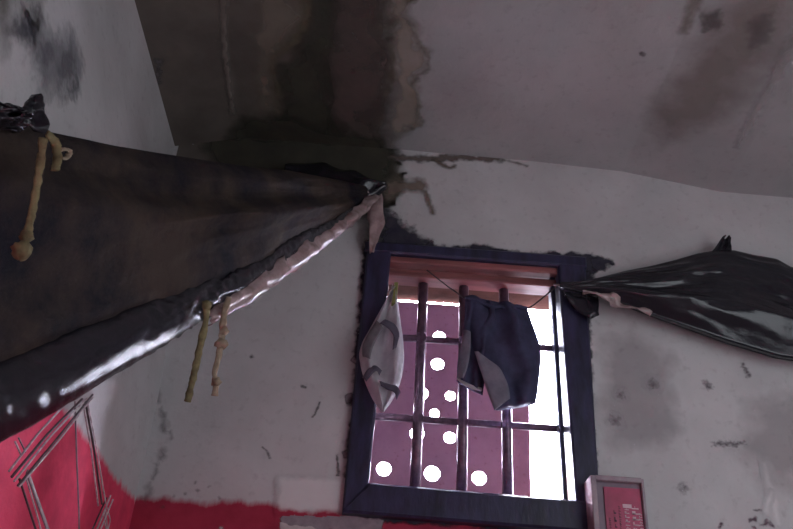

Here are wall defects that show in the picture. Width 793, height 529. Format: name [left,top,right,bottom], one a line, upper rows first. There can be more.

crack [389,154,527,169]
peeling [280,515,384,529]